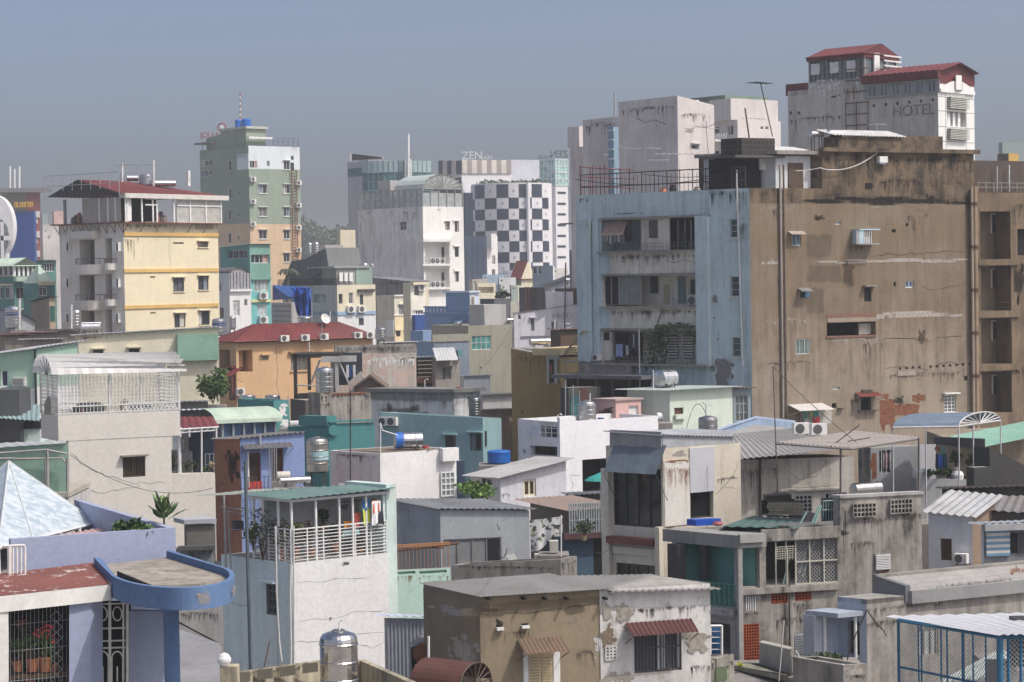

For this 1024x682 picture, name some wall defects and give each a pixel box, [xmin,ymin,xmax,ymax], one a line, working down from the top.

damp [805,180,970,220]
spalling [711,359,735,386]
spalling [879,393,926,431]
peeling [594,601,634,659]
peeling [682,632,713,654]